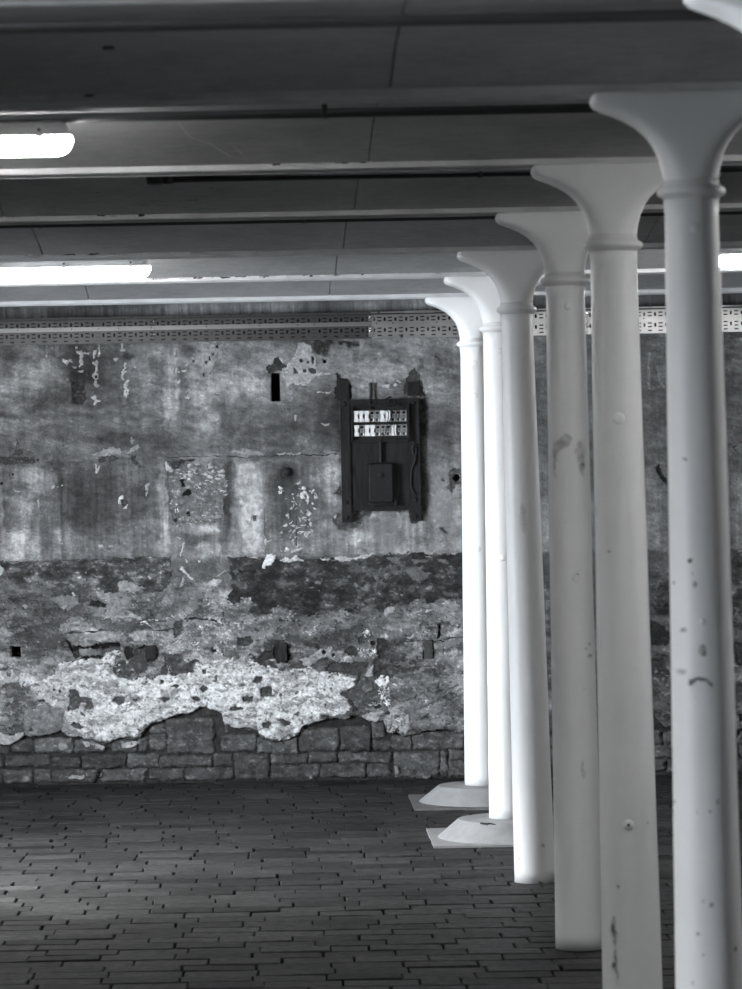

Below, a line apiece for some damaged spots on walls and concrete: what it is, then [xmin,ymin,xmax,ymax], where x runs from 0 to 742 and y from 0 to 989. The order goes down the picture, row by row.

peeling [61,344,101,405]
peeling [114,343,136,398]
peeling [266,342,352,401]
water stain [237,463,263,554]
peeling [730,549,742,624]
peeling [0,459,465,786]
spalling [650,620,671,646]
spalling [651,658,670,693]
spalling [733,641,742,683]
flaking render [653,715,672,775]